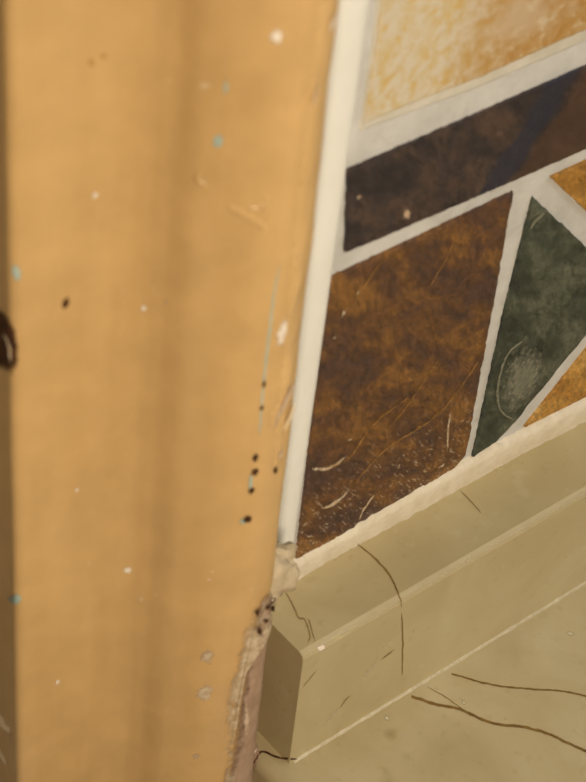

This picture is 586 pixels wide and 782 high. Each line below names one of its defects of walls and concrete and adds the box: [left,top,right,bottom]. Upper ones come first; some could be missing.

spalling [0,312,18,371]
spalling [256,598,276,635]
crack [358,544,404,673]
crack [451,673,586,697]
crack [411,688,586,752]
crack [254,749,296,763]